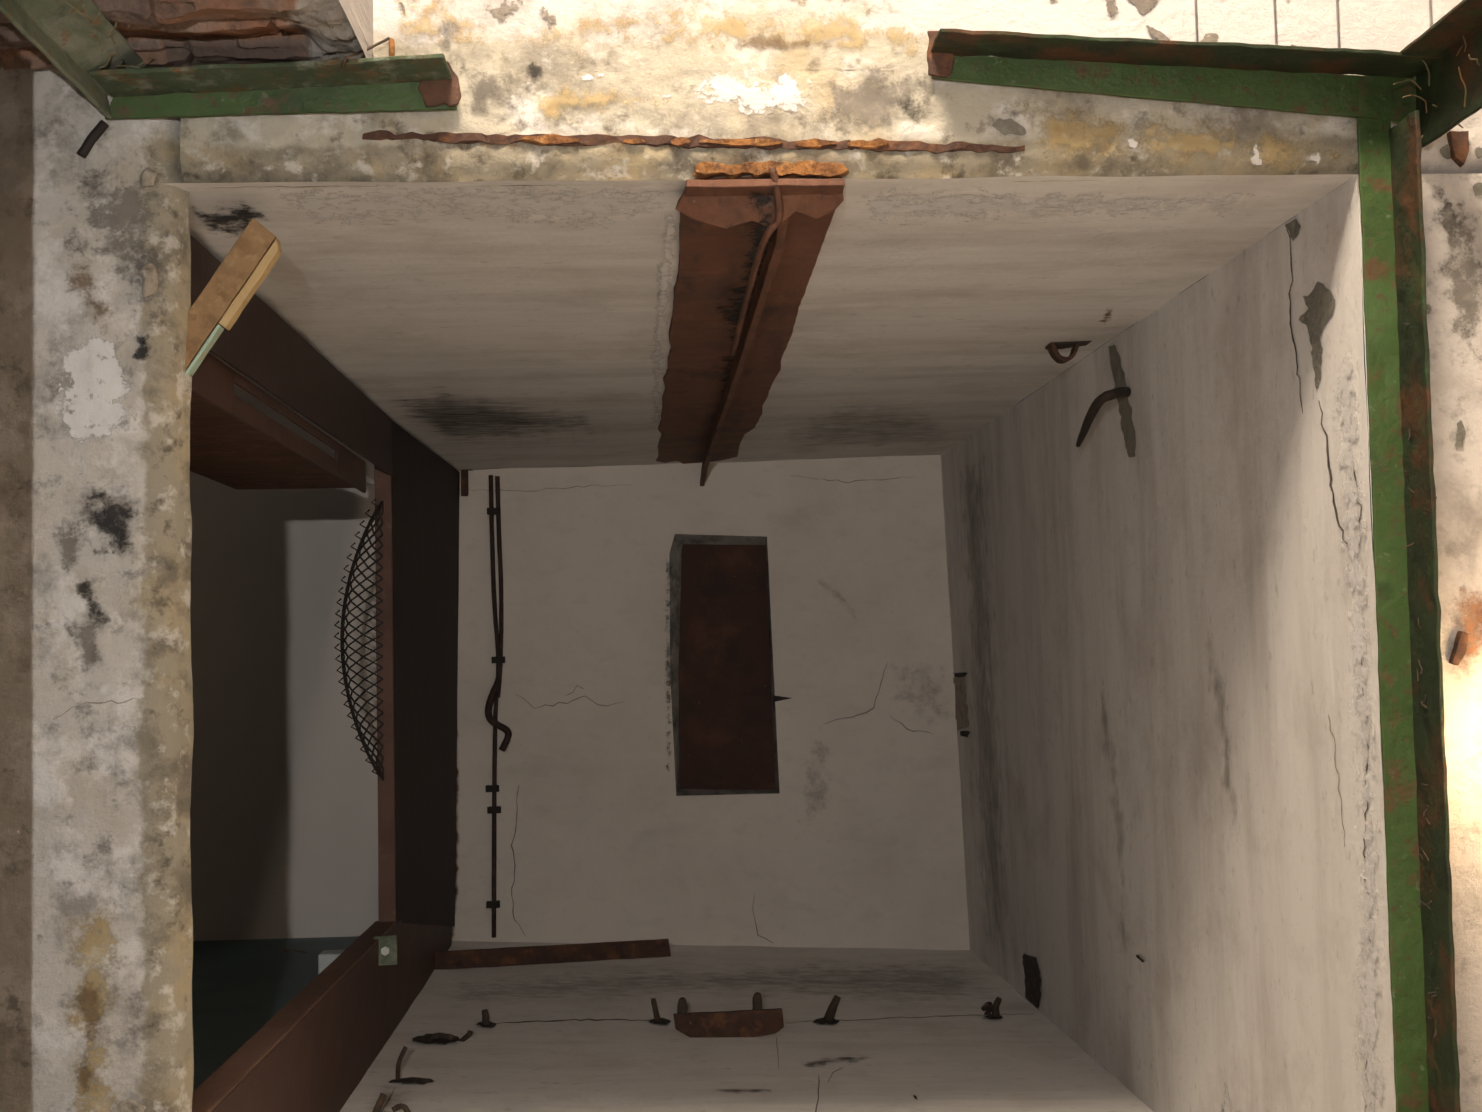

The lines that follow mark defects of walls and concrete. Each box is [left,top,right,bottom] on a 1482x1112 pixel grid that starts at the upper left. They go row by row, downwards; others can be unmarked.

peeling [485,0,523,23]
peeling [1106,0,1170,40]
damp [471,63,629,119]
damp [693,68,811,115]
rust [675,177,844,229]
spalling [1285,219,1301,241]
damp [66,173,168,360]
damp [1438,189,1482,345]
spalling [1299,281,1335,389]
damp [66,581,111,671]
crack [516,686,622,709]
crack [823,663,932,734]